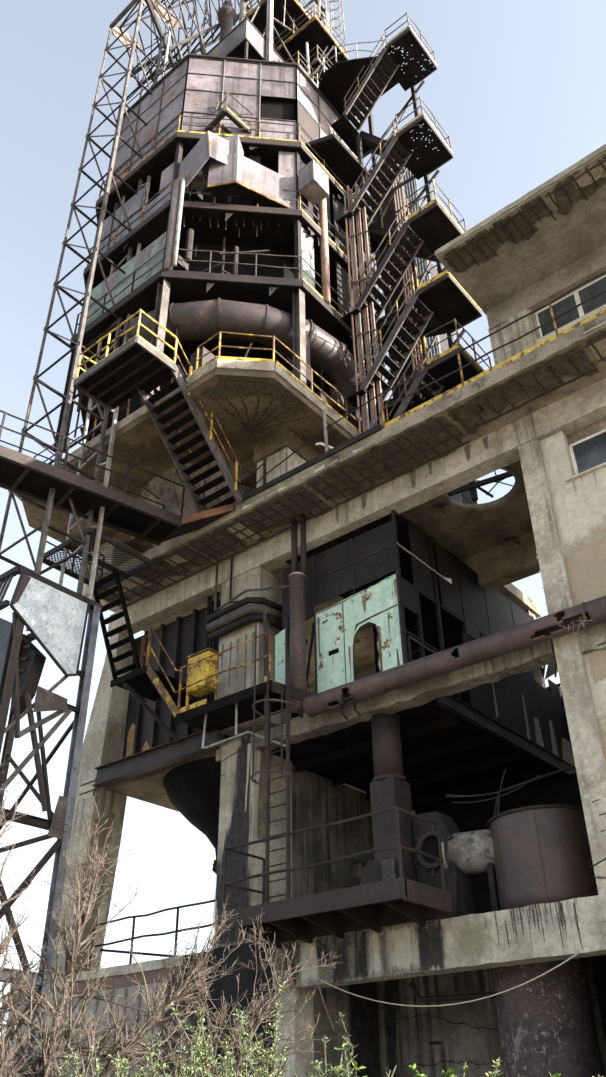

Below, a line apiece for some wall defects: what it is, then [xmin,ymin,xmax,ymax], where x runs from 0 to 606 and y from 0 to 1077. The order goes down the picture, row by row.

spalling [443,156,606,273]
crack [208,395,310,433]
peeling [317,577,398,672]
damp [285,920,444,984]
damp [485,899,580,951]